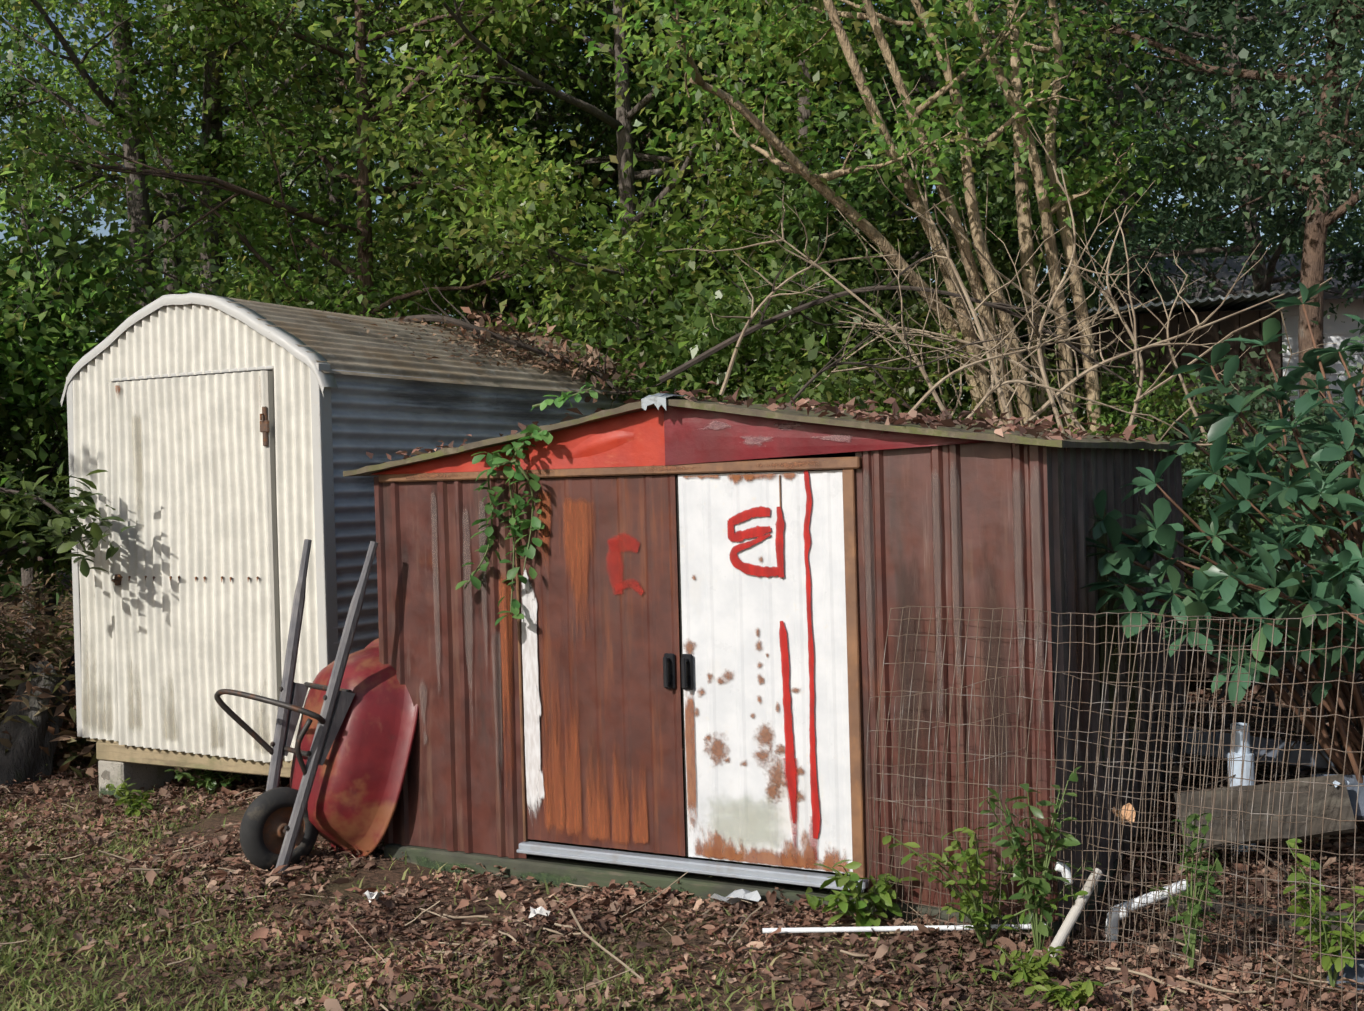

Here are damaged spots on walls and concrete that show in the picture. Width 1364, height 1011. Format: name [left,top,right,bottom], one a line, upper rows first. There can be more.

rust [537,492,591,609]
rust [544,720,648,843]
rust [685,629,804,823]
rust [695,832,849,873]